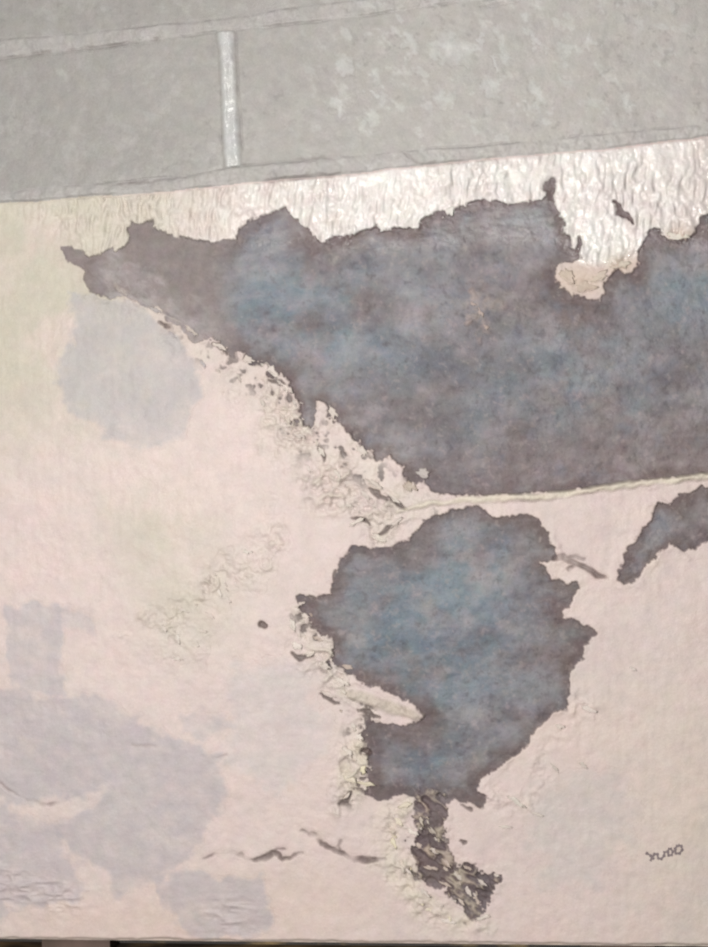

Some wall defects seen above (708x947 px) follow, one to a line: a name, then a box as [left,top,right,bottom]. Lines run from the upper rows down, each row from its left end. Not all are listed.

spalling [18,138,708,550]
spalling [618,485,708,585]
spalling [256,617,271,631]
spalling [277,506,597,944]
crack [200,826,388,866]